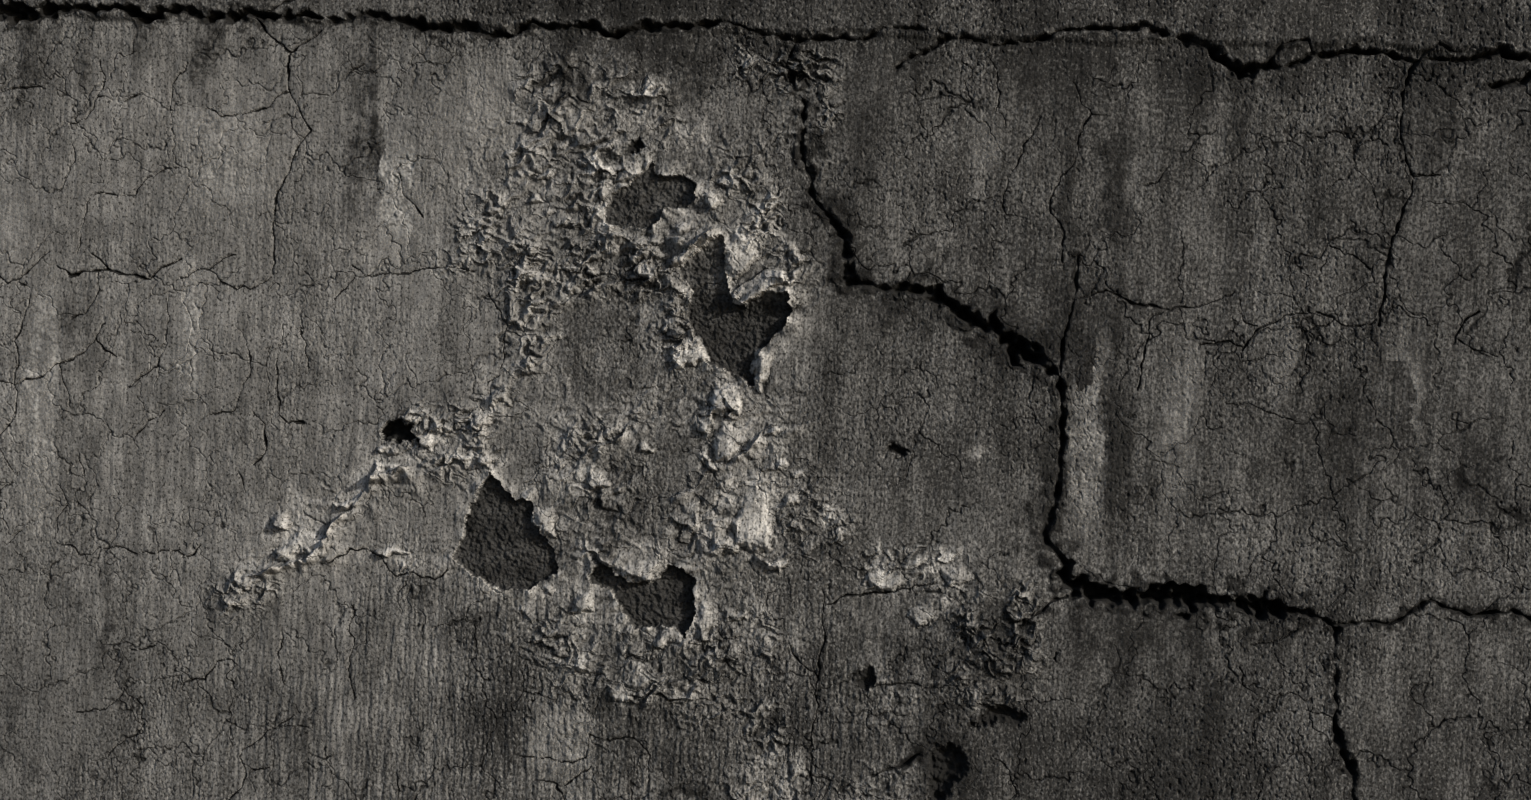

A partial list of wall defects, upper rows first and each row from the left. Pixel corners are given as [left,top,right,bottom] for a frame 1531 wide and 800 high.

flaking render [530,133,802,400]
crack [0,0,1531,359]
crack [0,251,117,507]
crack [209,324,310,493]
flaking render [221,419,428,610]
flaking render [443,463,802,650]
flaking render [636,392,810,511]
crack [798,99,1531,648]
flaking render [856,665,878,695]
crack [789,581,951,787]
hole [923,702,1029,800]
crack [1306,673,1359,800]